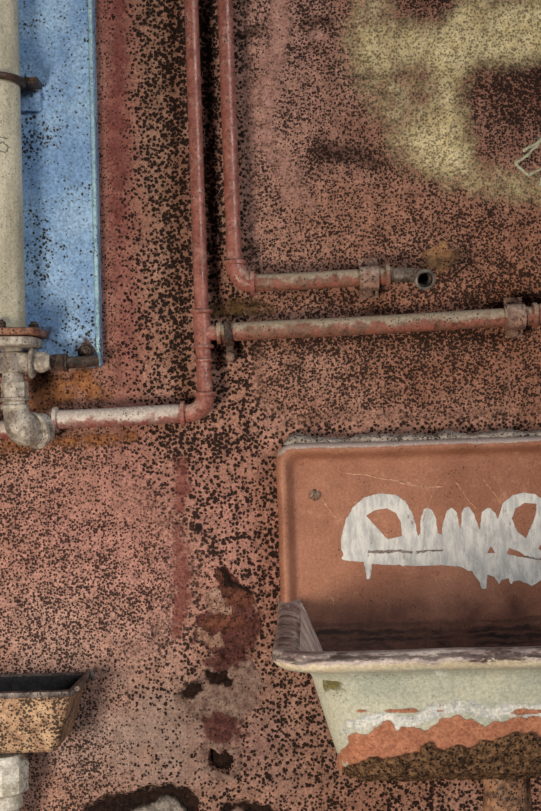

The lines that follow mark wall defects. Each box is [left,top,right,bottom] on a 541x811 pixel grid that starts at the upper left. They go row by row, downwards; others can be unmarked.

corrosion [425,242,457,271]
corrosion [27,371,99,412]
spalling [175,566,267,781]
spalling [83,784,199,811]